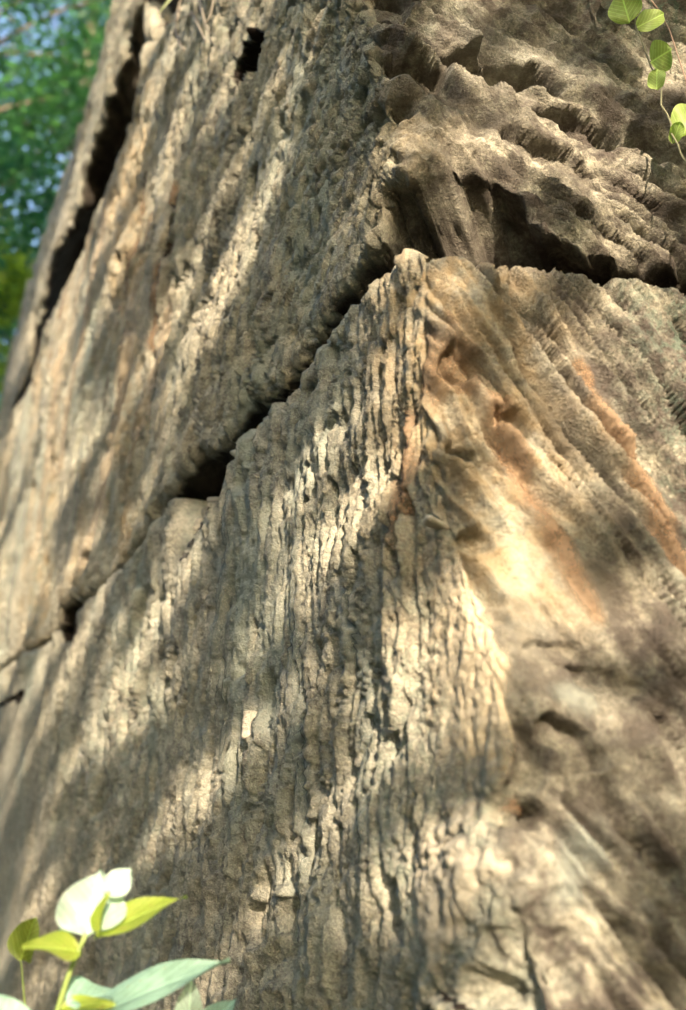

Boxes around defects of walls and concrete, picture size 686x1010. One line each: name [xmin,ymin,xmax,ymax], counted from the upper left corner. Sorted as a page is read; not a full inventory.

crack [147,182,178,351]
crack [439,991,473,1010]